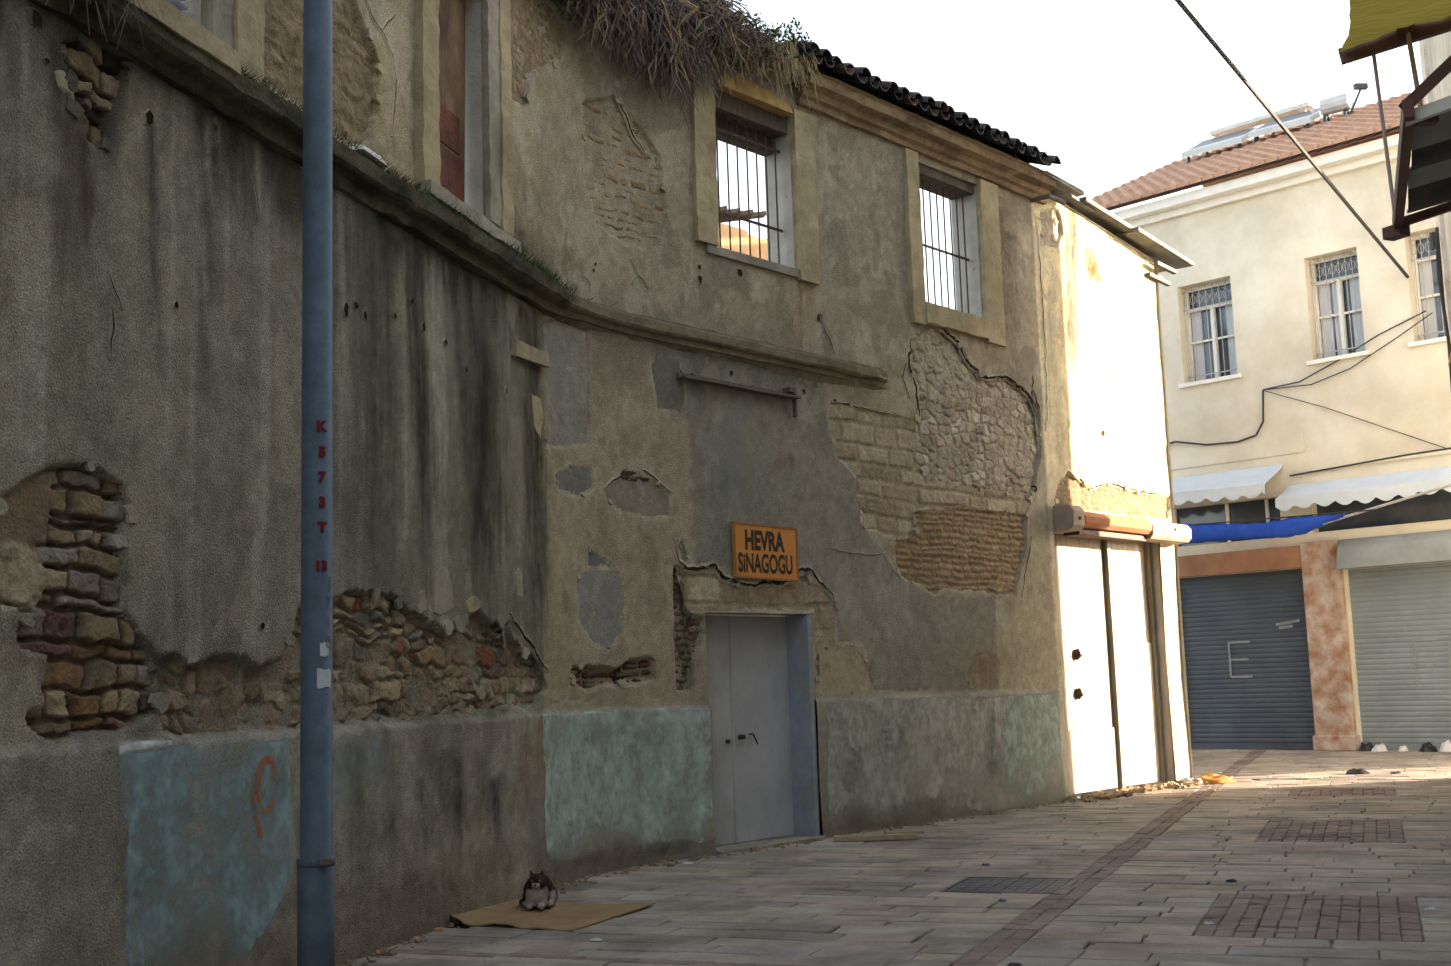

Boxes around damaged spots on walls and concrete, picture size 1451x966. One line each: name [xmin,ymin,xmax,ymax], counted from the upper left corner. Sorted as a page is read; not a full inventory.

flaking render [54,33,134,153]
flaking render [264,0,303,112]
flaking render [333,0,386,146]
water stain [408,252,427,493]
water stain [469,280,490,535]
flaking render [531,319,587,447]
flaking render [555,463,669,519]
flaking render [828,325,1042,595]
flaking render [1054,473,1168,519]
crack [672,537,886,612]
flaking render [0,463,301,966]
flaking render [333,538,835,854]